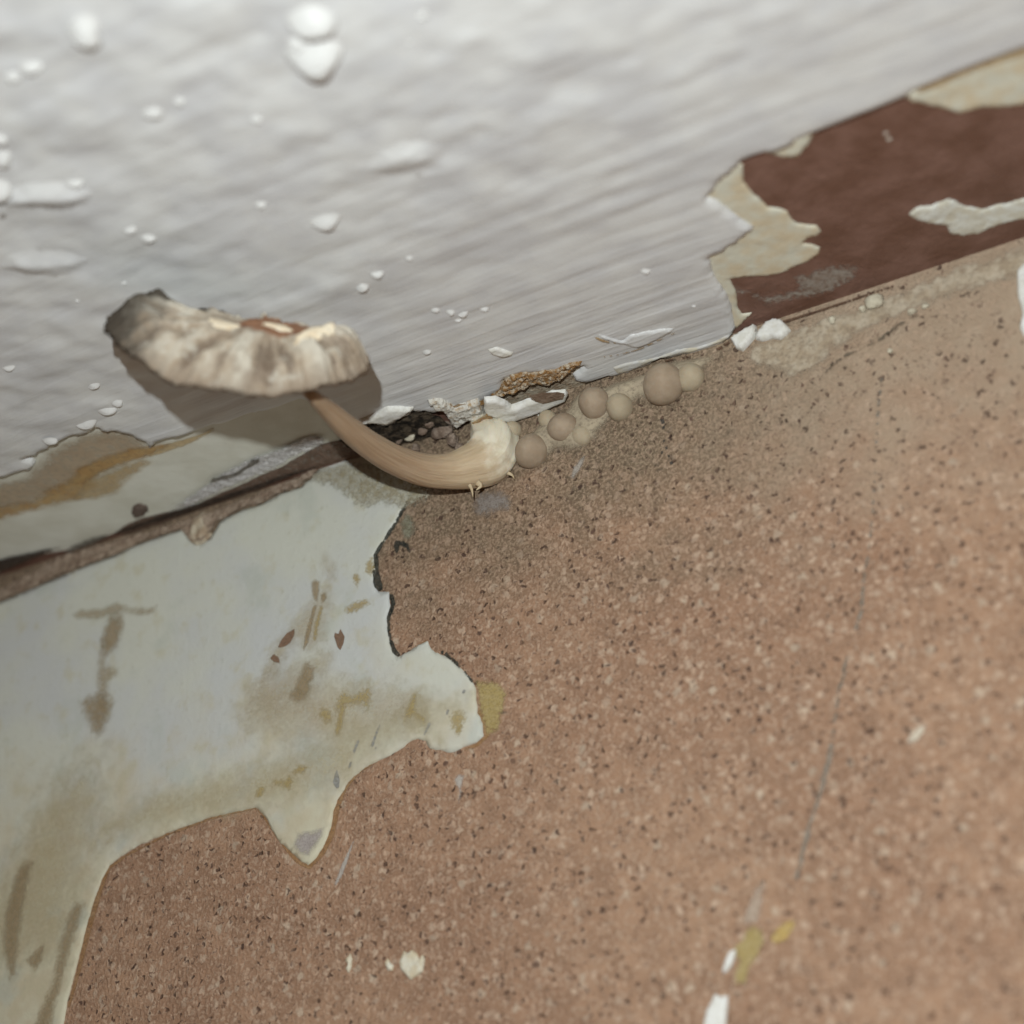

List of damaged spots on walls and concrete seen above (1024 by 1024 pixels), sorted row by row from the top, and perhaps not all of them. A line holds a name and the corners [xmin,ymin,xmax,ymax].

peeling [595,47,1024,373]
leakage [0,431,145,507]
flaking render [359,389,568,445]
leakage [78,605,122,652]
peeling [0,399,489,1024]
crack [795,657,848,879]